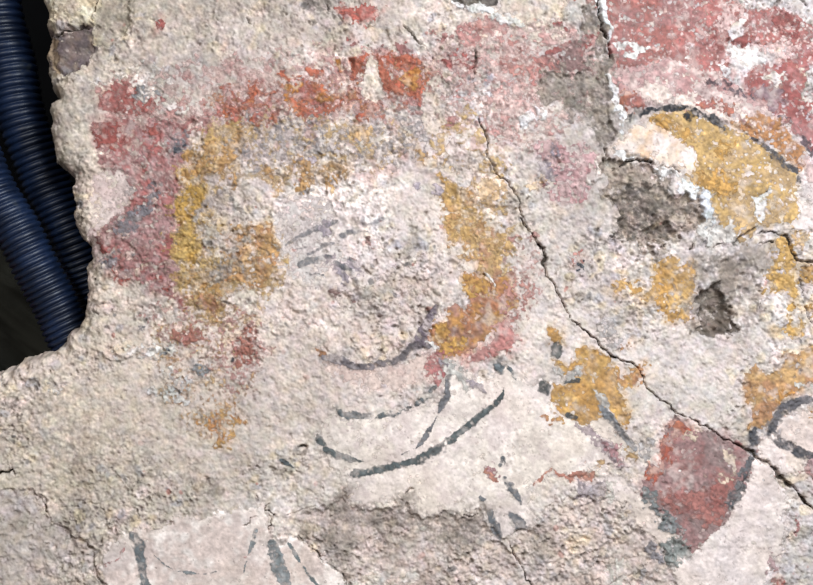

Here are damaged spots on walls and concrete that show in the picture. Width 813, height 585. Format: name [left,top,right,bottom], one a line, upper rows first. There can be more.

spalling [536,5,618,146]
crack [596,0,610,57]
crack [603,148,652,165]
spalling [591,150,707,260]
crack [500,178,710,429]
spalling [689,280,740,339]
crack [719,227,812,323]
crack [732,442,813,509]